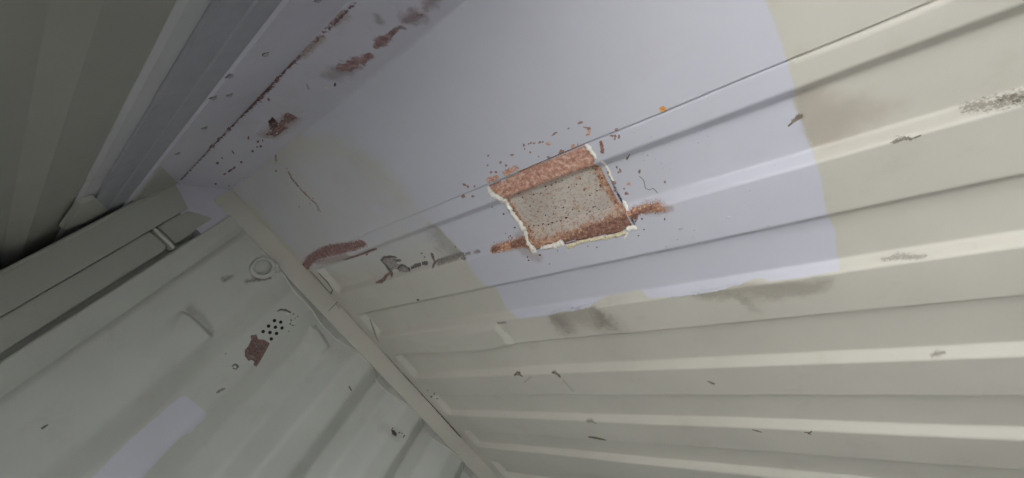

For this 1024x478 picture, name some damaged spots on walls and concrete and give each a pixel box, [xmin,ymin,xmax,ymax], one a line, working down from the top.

corrosion [336,26,405,74]
corrosion [180,2,356,186]
corrosion [461,121,666,265]
corrosion [302,240,377,270]
peeling [376,246,481,284]